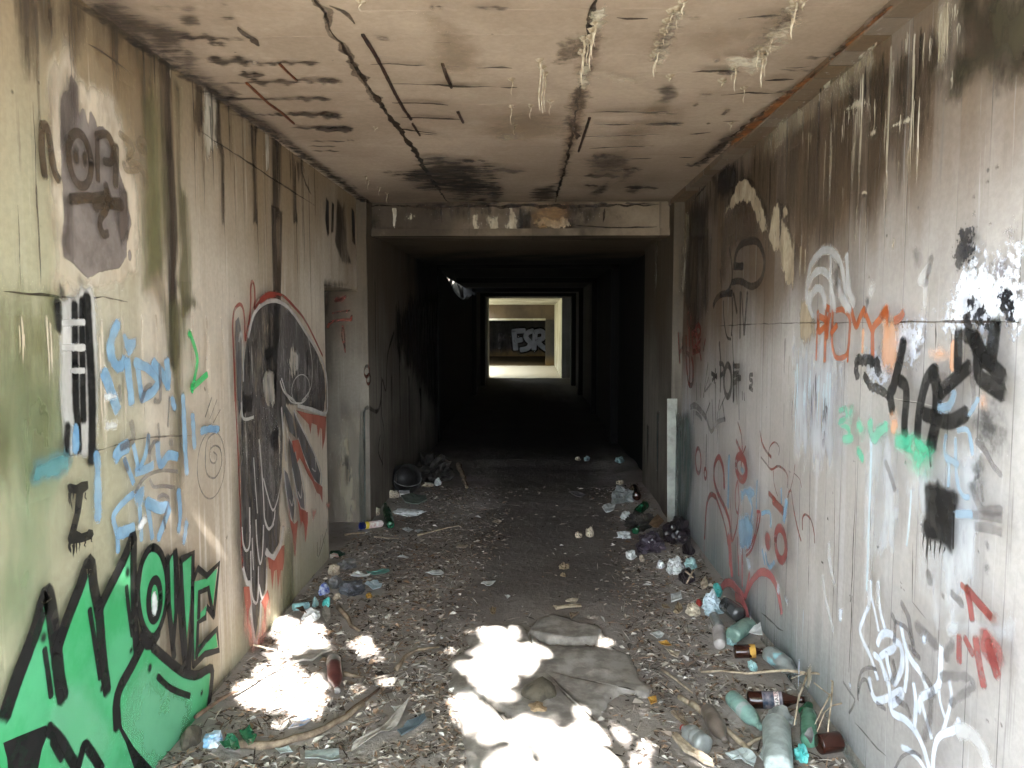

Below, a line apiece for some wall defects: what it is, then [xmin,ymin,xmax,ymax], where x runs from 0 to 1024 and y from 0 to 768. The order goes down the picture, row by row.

crack [312,0,733,228]
leakage [645,88,680,126]
corrosion [686,6,893,167]
leakage [683,0,1024,337]